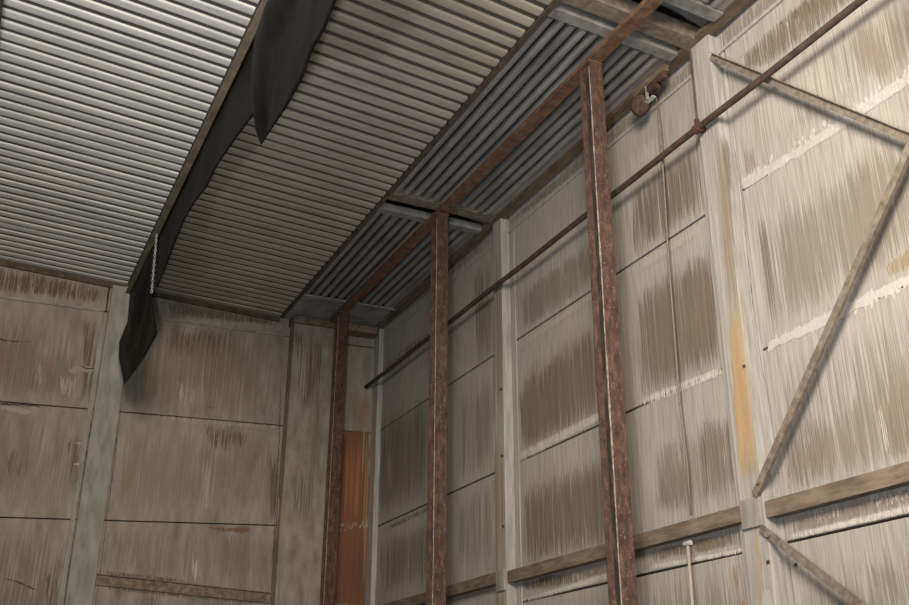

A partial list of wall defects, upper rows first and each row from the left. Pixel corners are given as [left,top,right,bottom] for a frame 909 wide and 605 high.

water stain [510,66,622,605]
water stain [629,138,722,408]
rust [728,277,759,485]
water stain [714,0,909,493]
rust [335,430,370,605]